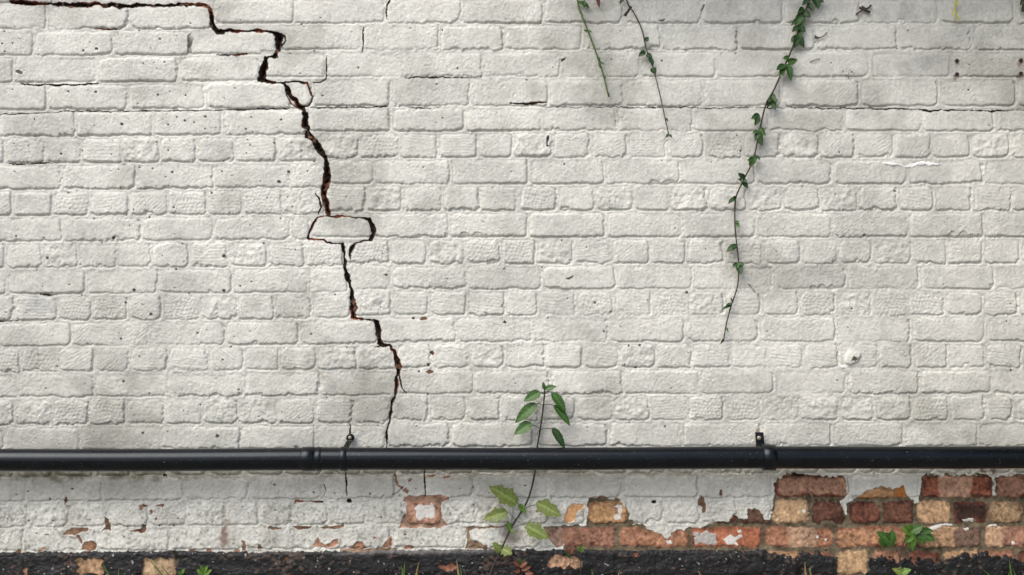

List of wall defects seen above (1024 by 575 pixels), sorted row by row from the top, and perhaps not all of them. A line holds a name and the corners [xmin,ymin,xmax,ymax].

crack [0,0,439,447]
flaking render [63,527,106,575]
peeling [102,504,190,538]
crack [293,471,348,504]
peeling [268,473,512,552]
peeling [543,471,1024,575]